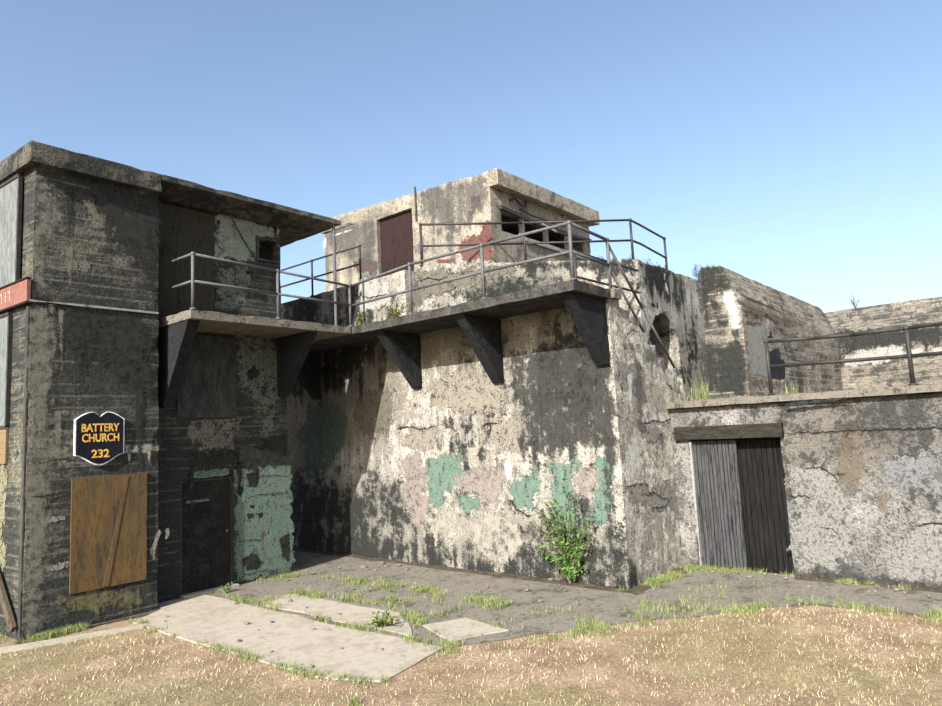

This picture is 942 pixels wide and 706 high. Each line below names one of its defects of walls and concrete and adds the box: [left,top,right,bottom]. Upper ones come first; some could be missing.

peeling [214,214,280,313]
leakage [693,264,807,395]
spalling [184,417,242,455]
peeling [193,464,296,584]
peeling [233,334,280,438]
leakage [189,403,347,520]
leakage [424,510,457,547]
leakage [471,511,527,571]
leakage [504,460,513,480]
leakage [508,255,669,558]
crack [628,480,673,509]
leakage [630,510,671,574]